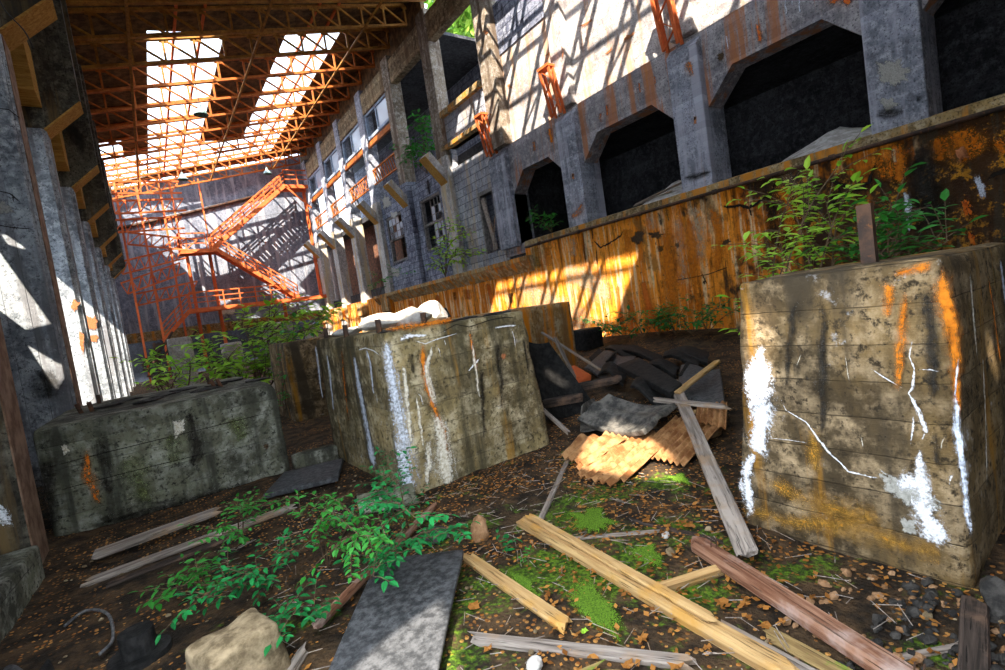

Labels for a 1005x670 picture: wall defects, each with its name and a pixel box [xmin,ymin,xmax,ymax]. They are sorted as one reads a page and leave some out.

corrosion [877,143,908,181]
corrosion [932,128,1005,162]
corrosion [616,209,723,333]
corrosion [897,263,929,275]
leakage [785,306,796,384]
leakage [817,307,827,429]
corrosion [884,285,907,382]
leakage [922,294,939,396]
corrosion [937,276,960,403]
leakage [740,350,773,515]
leakage [897,436,948,544]
leakage [949,366,971,526]